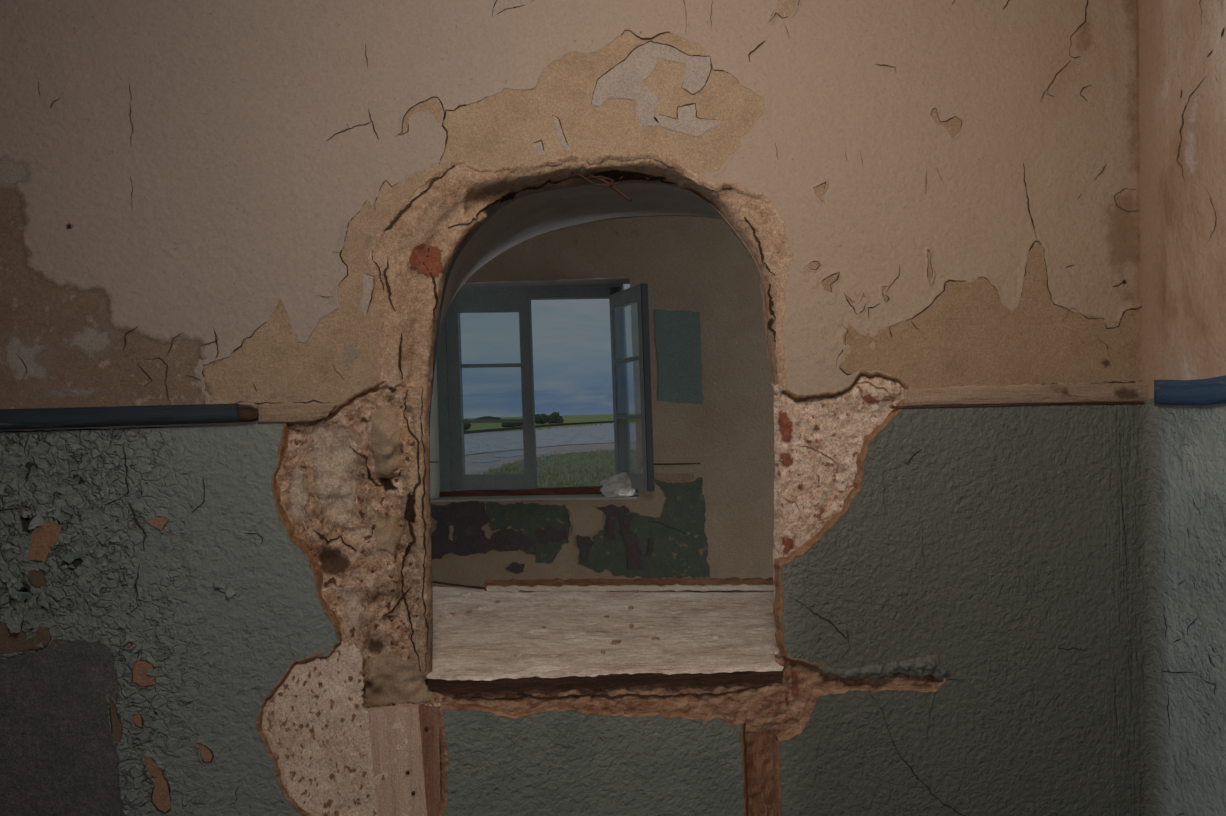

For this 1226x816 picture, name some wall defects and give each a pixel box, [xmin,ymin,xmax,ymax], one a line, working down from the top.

crack [1040,0,1092,102]
crack [127,83,135,140]
crack [328,108,379,140]
crack [1023,163,1037,238]
crack [1078,165,1139,212]
crack [836,266,920,365]
peeling [368,21,1144,742]
flaking render [0,156,783,816]